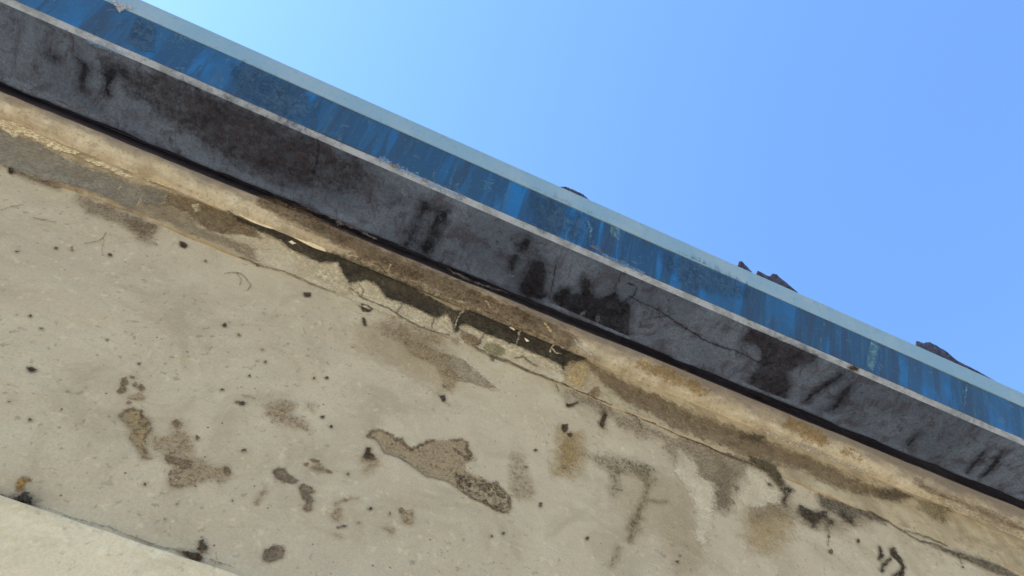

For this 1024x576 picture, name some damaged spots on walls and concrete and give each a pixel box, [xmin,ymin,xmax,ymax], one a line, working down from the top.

water stain [77,58,89,90]
water stain [98,58,363,190]
flaking render [117,363,152,459]
crack [228,257,764,468]
water stain [164,190,1024,550]
flaking render [263,546,285,562]
flaking render [273,468,315,511]
flaking render [363,429,543,512]
crack [611,467,667,565]
crack [868,510,962,576]